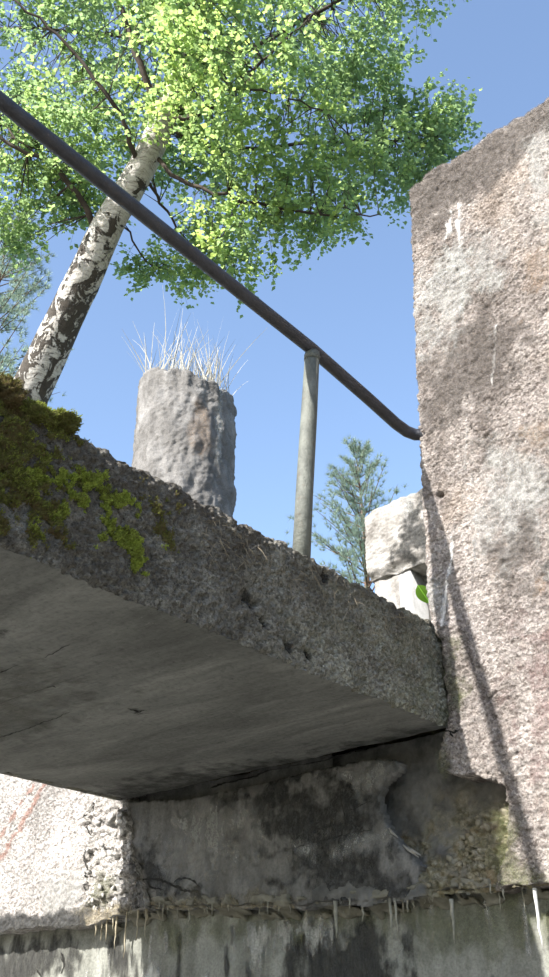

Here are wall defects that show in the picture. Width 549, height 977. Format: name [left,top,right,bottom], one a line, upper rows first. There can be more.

corrosion [0,784,45,859]
water stain [0,879,92,977]
water stain [81,760,506,977]
spalling [312,731,549,907]
water stain [522,887,549,905]